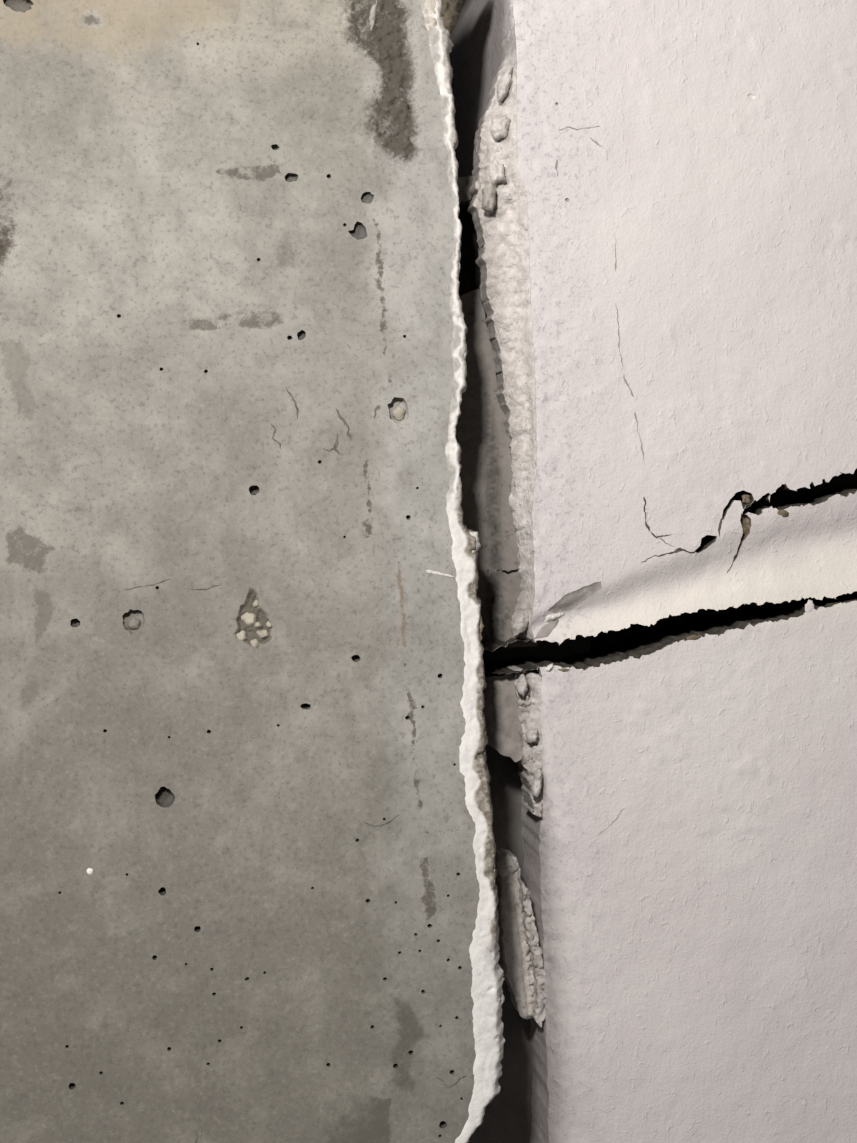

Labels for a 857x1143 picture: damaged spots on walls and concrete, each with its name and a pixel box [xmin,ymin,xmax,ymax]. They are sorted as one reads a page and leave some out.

spalling [0,152,29,331]
crack [615,304,644,459]
spalling [233,587,275,650]
spalling [334,0,602,1143]
crack [481,591,857,675]
crack [641,468,857,572]